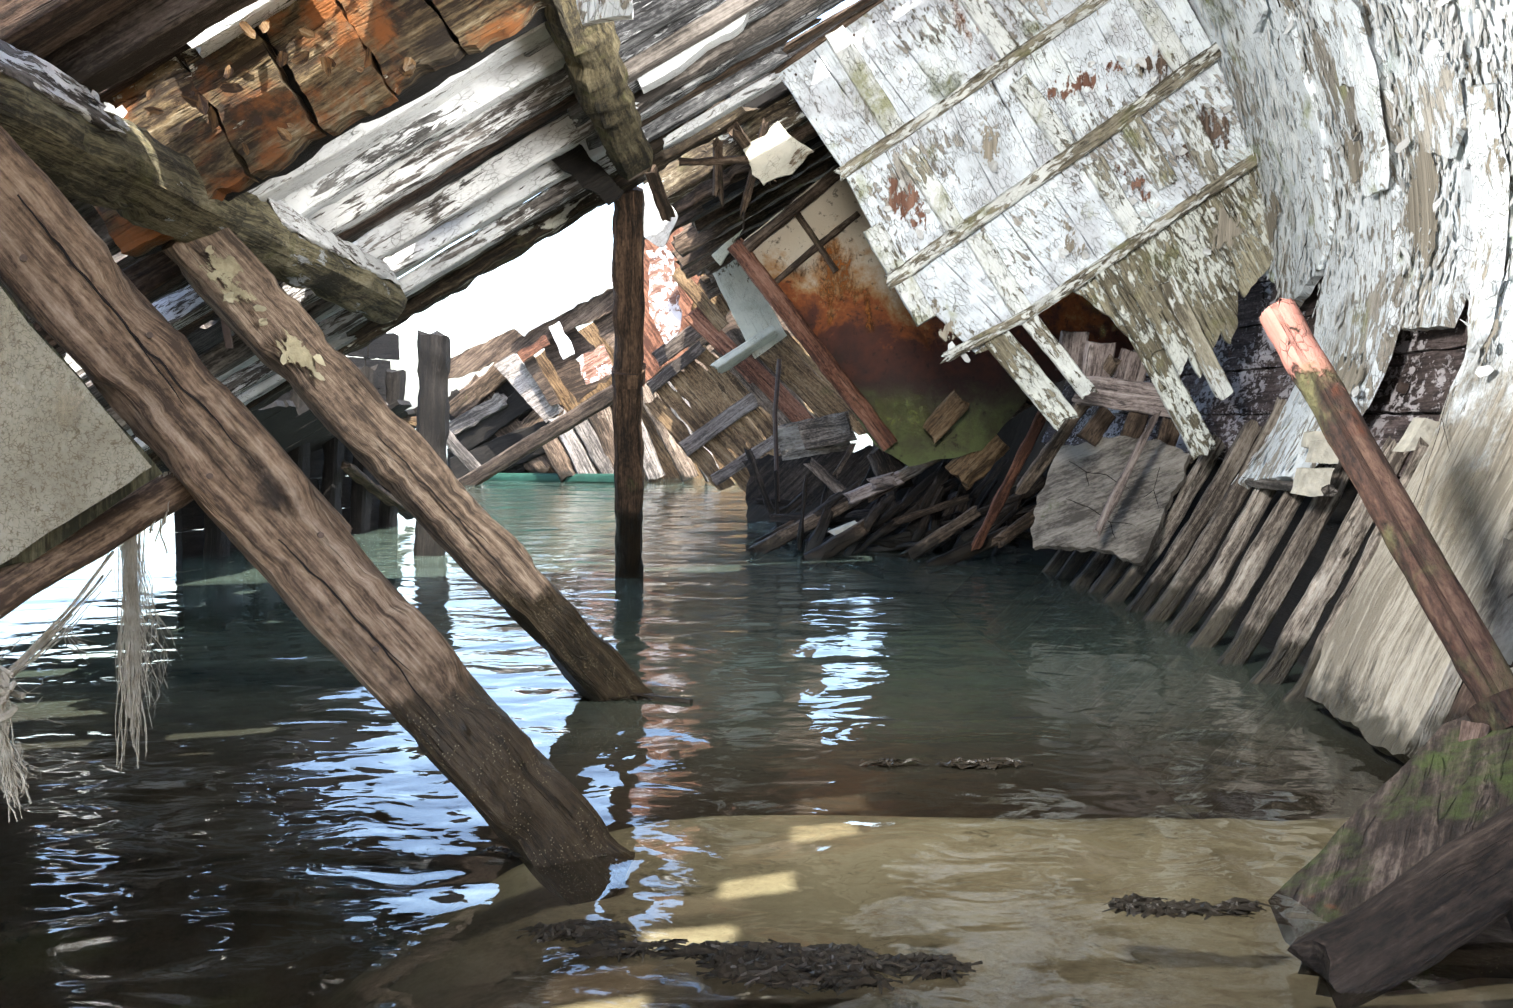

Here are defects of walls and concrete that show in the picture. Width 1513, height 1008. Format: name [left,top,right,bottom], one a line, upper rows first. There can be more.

peeling [1029,45,1181,107]
peeling [972,121,1000,173]
peeling [882,178,930,239]
peeling [1058,213,1089,260]
peeling [1168,0,1513,398]
peeling [199,245,326,381]
rust [793,244,874,331]
peeling [931,298,970,363]
peeling [1231,391,1307,485]